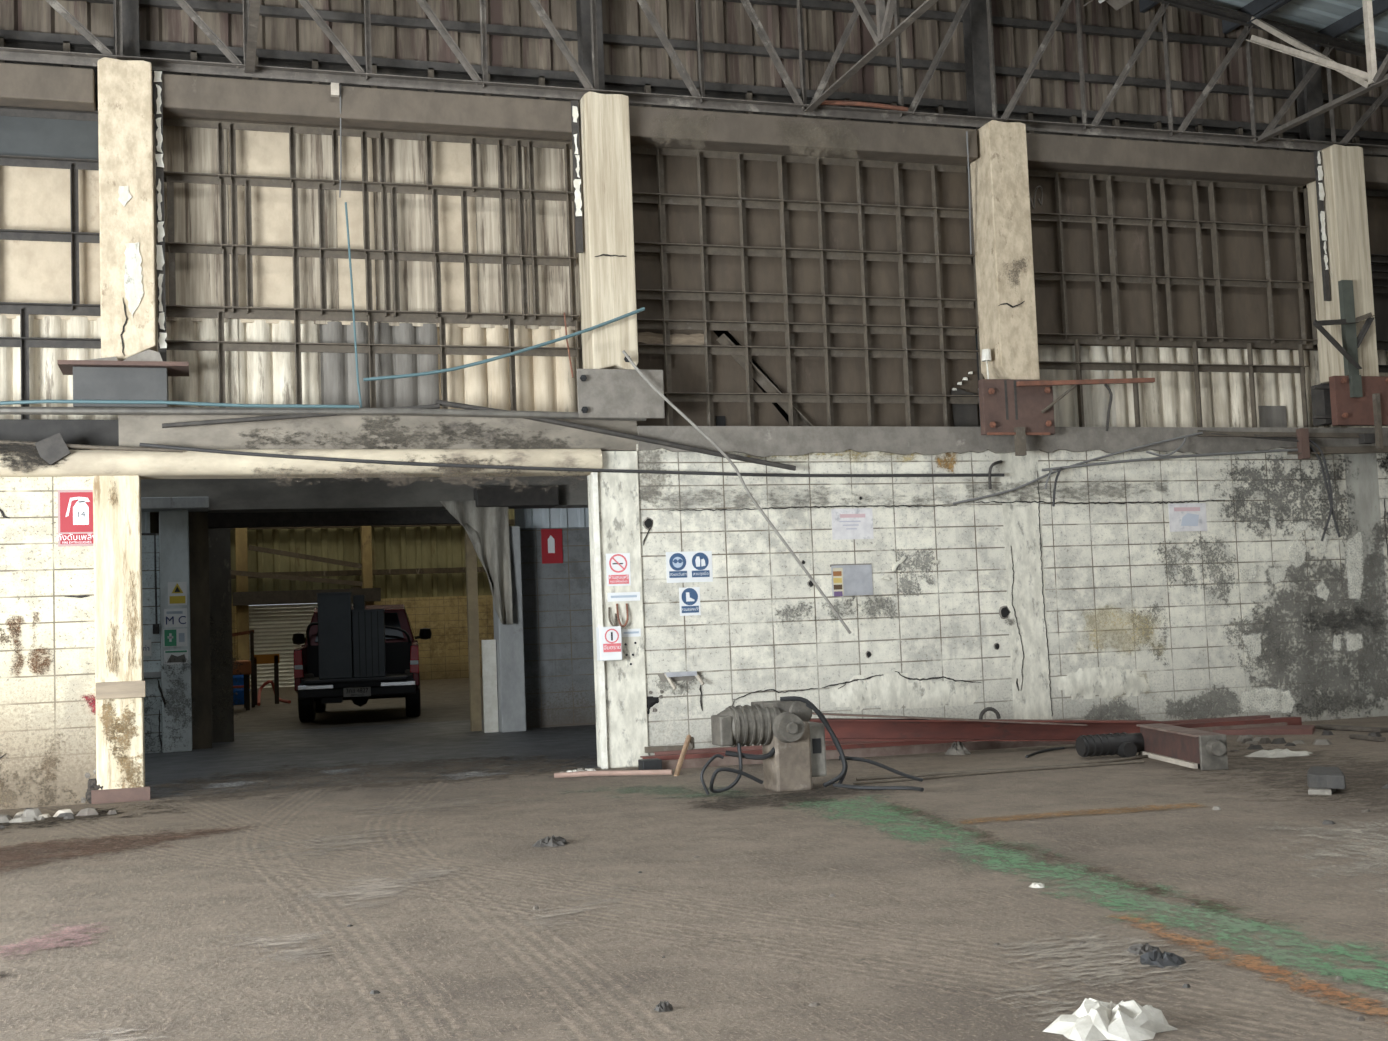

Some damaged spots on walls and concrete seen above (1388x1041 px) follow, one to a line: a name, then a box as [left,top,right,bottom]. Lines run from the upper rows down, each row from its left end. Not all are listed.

crack [643,472,1216,714]
leakage [1131,603,1166,665]
leakage [1157,455,1388,720]